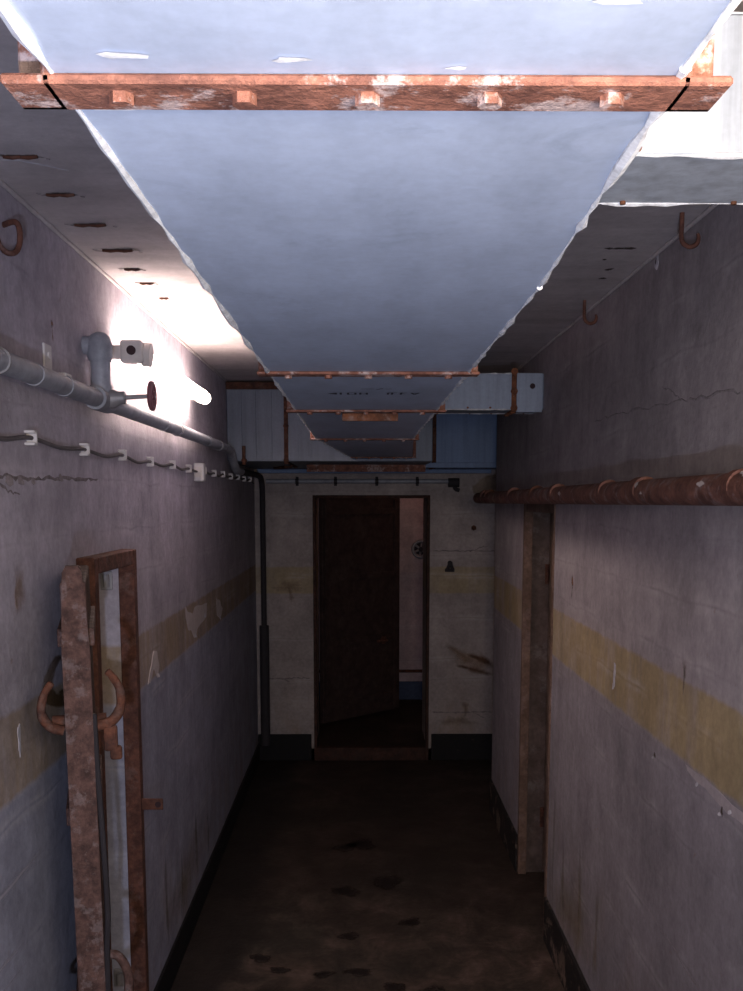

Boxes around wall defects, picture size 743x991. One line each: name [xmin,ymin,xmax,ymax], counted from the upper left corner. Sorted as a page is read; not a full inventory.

crack [0,473,98,495]
peeling [185,598,223,638]
peeling [685,764,743,825]